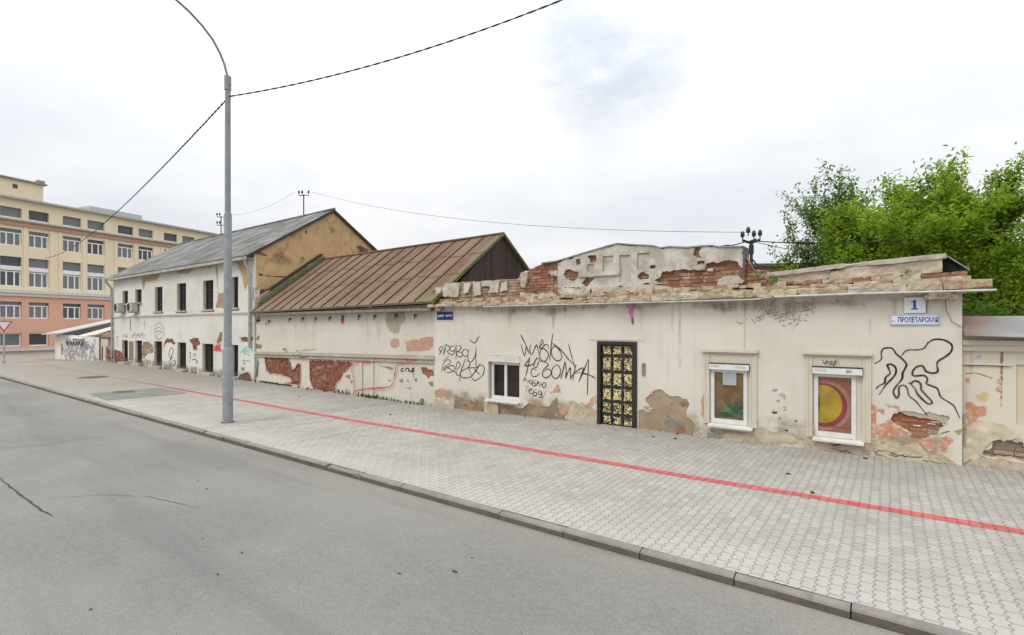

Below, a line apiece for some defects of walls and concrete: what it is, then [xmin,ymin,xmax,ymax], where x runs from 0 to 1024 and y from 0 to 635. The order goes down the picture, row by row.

spalling [924,292,959,301]
flaking render [114,339,176,363]
flaking render [237,317,353,392]
peeling [386,312,433,352]
flaking render [499,385,568,420]
spalling [638,389,1024,472]